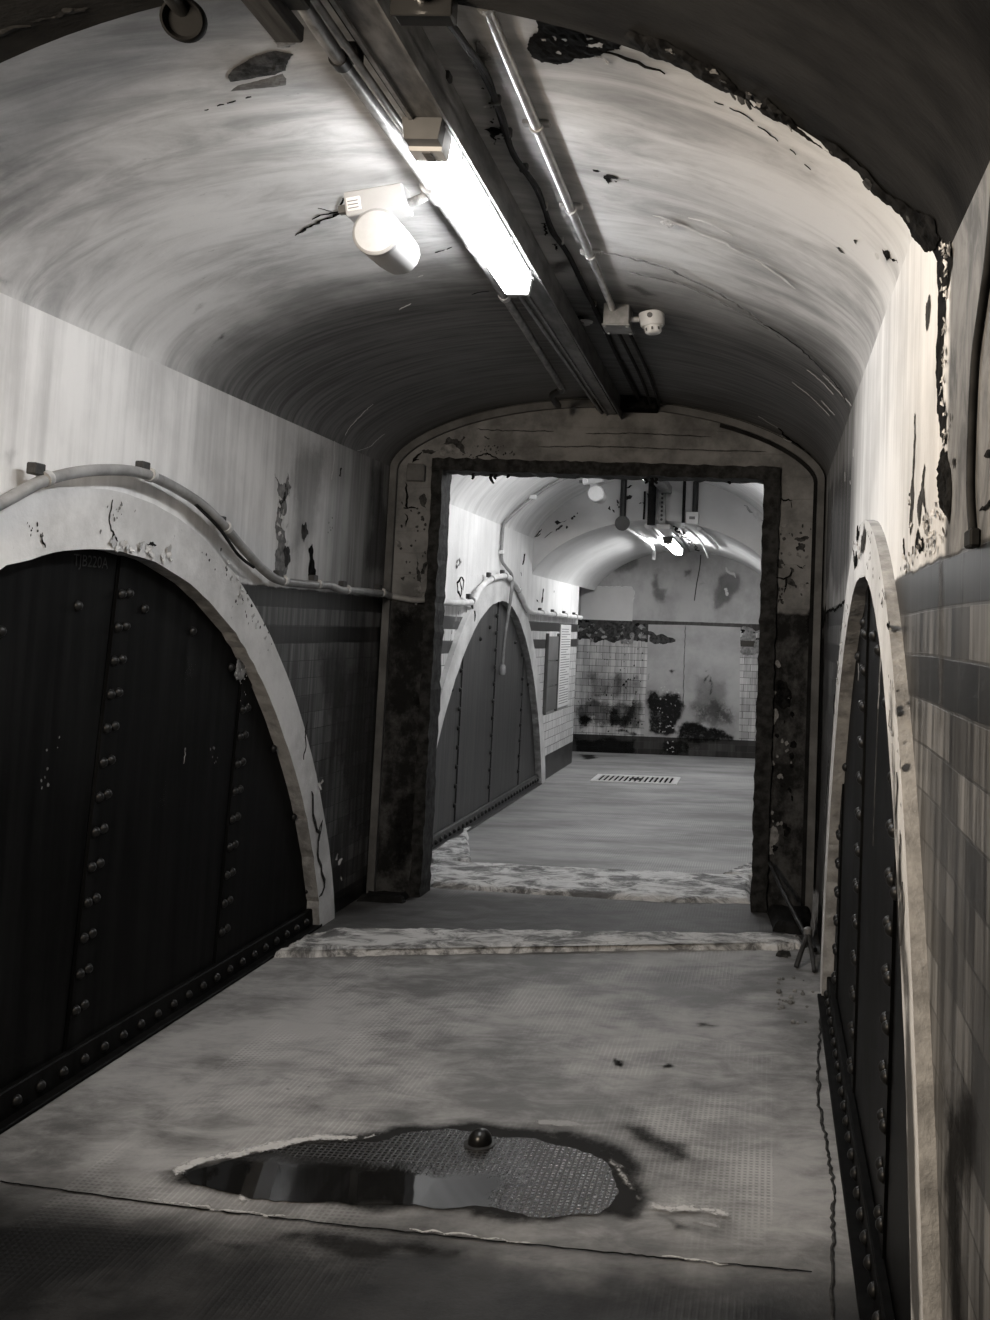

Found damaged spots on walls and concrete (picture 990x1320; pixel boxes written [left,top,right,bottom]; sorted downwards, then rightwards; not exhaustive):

peeling [228,41,296,91]
crack [295,198,344,236]
spalling [527,20,955,574]
peeling [275,475,316,576]
peeling [853,526,885,604]
damp [576,648,733,760]
crack [0,1017,836,1320]